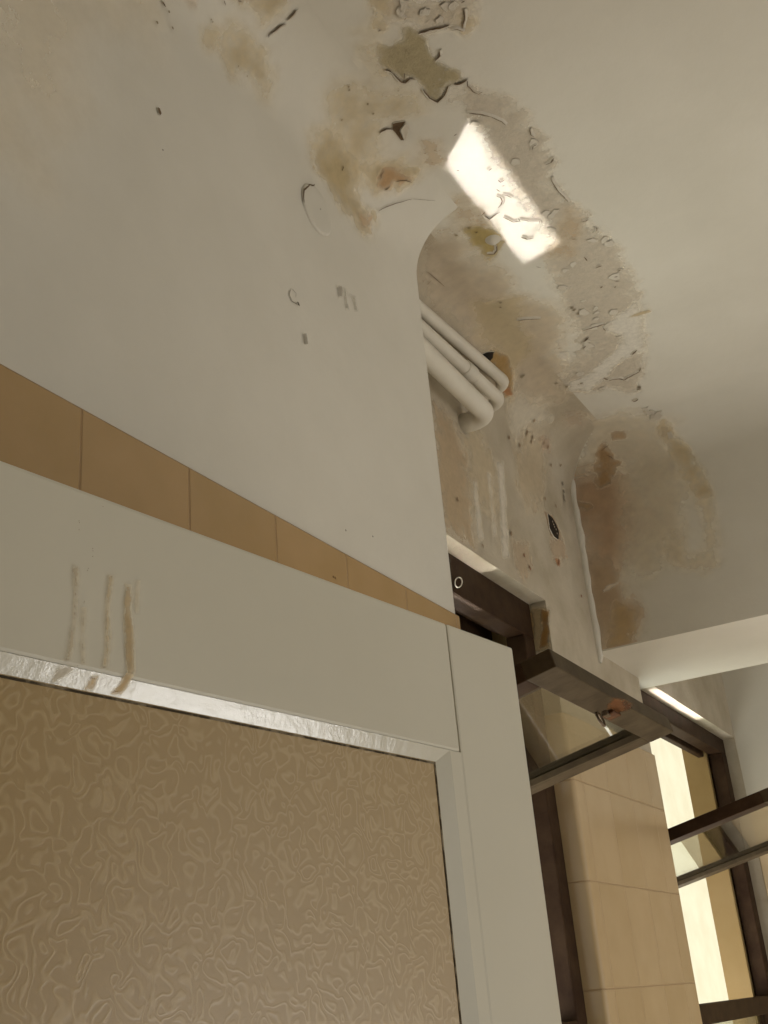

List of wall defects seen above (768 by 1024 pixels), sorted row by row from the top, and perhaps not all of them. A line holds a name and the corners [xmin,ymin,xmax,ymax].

peeling [372,0,644,402]
spalling [545,512,561,541]
damp [428,236,711,650]